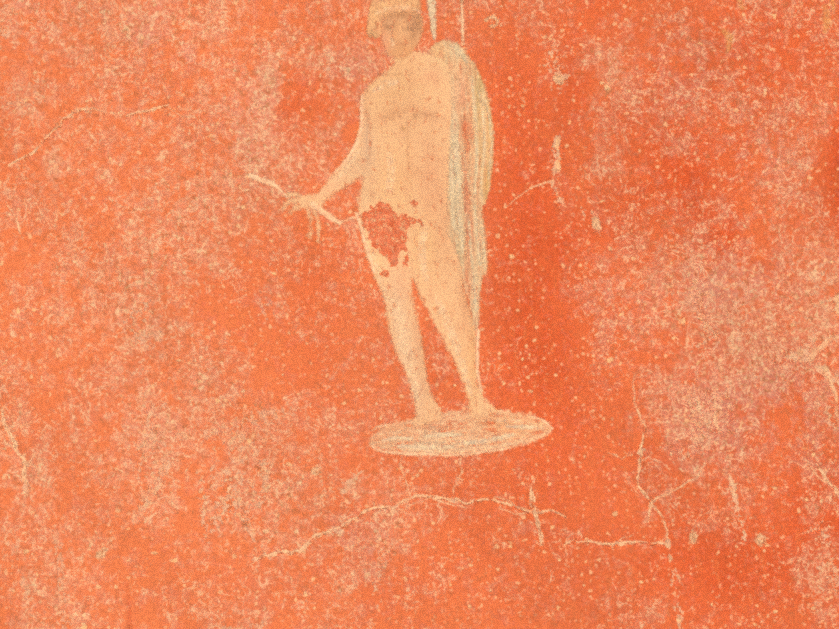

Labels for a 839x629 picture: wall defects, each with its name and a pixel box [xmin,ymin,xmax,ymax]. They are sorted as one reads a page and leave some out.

crack [8,104,196,167]
crack [251,456,567,564]
crack [565,374,706,550]